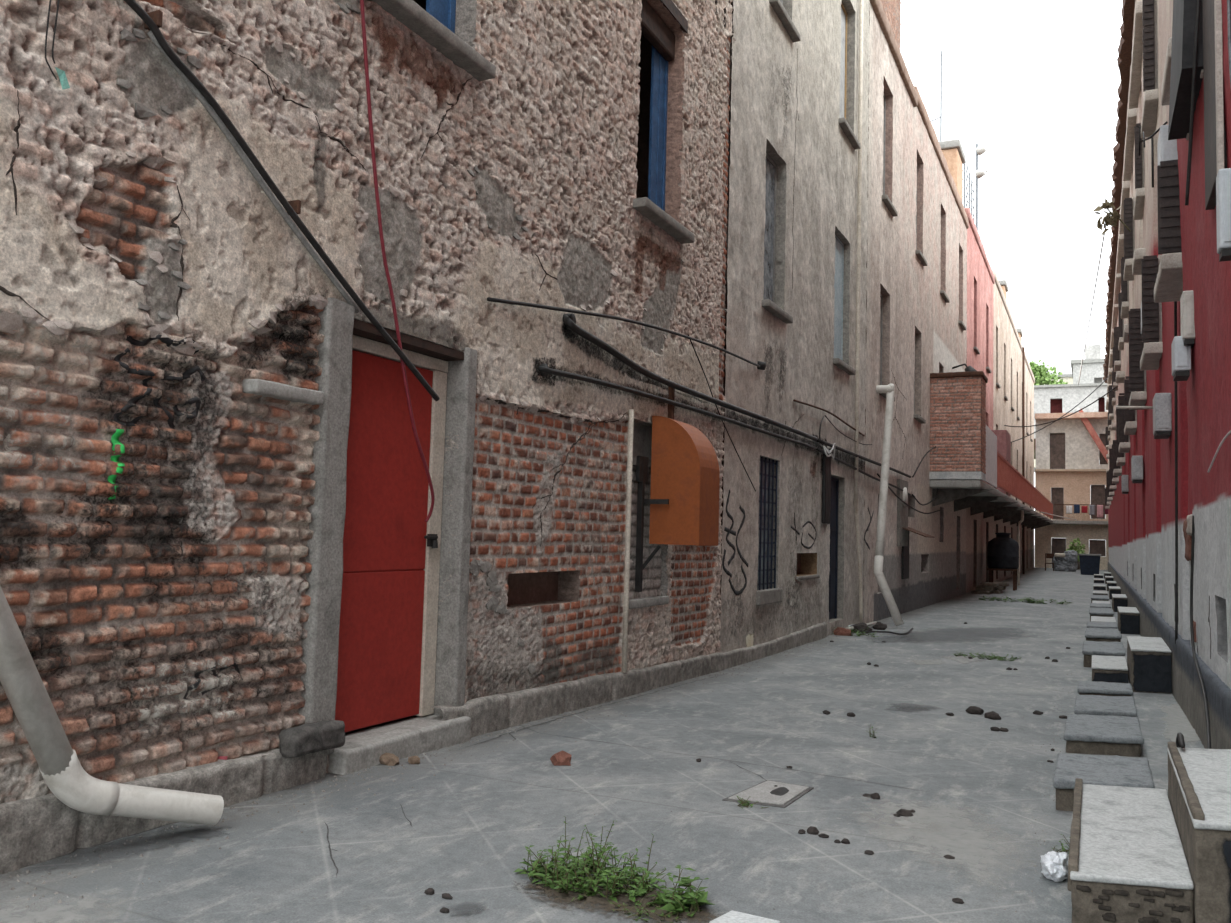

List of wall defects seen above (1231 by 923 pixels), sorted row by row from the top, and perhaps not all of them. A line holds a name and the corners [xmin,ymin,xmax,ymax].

crack [6,78,21,215]
crack [0,286,50,321]
flaking render [0,151,345,783]
leakage [144,520,292,611]
flaking render [465,393,629,702]
flaking render [669,545,719,647]
flaking render [0,682,53,803]
leakage [140,657,234,724]